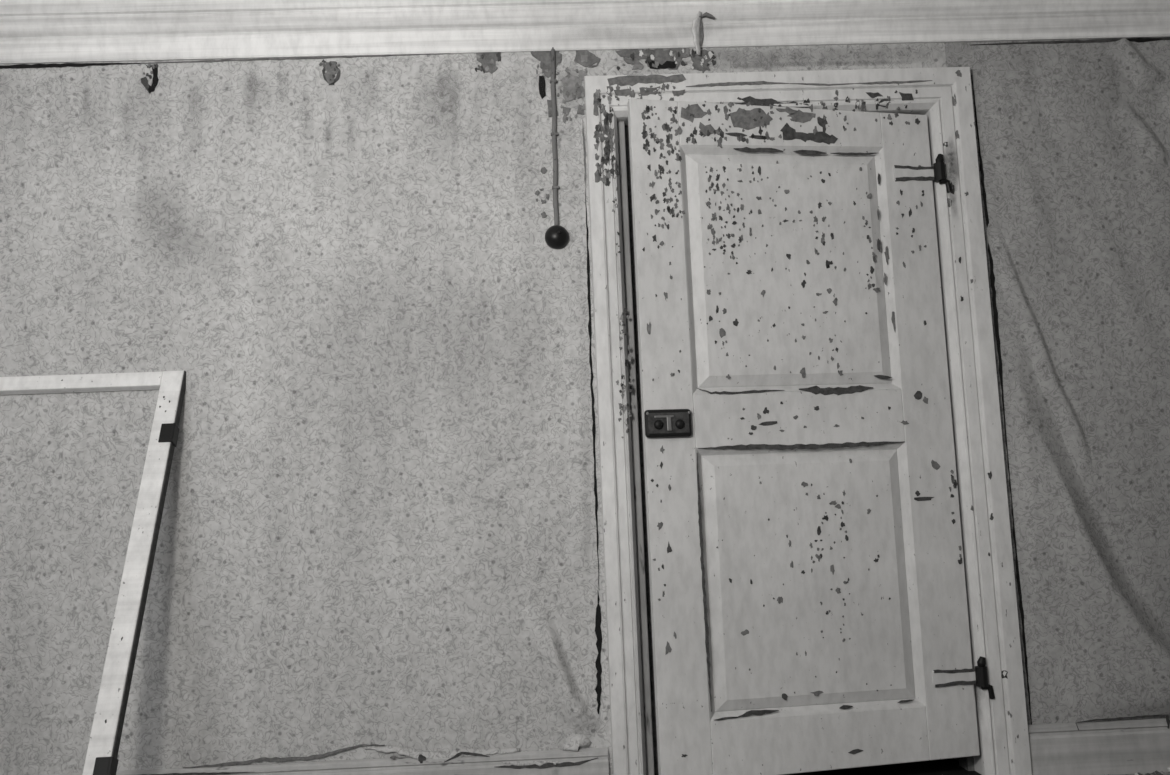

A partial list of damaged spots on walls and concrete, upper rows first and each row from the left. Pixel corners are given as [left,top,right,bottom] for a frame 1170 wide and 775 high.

peeling [475,52,501,74]
peeling [531,11,920,251]
peeling [702,164,846,314]
peeling [853,173,889,293]
peeling [896,189,926,268]
peeling [616,308,633,438]
peeling [706,289,739,356]
peeling [795,323,853,378]
peeling [740,401,785,435]
peeling [931,460,958,498]
peeling [790,482,851,642]